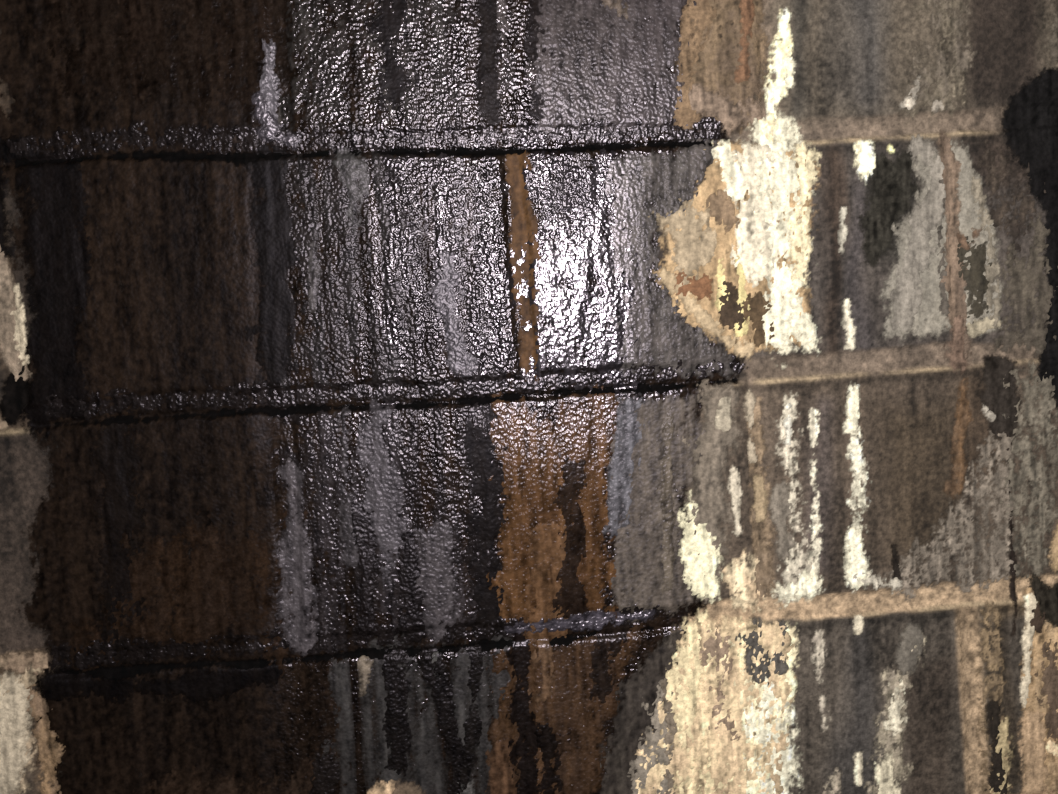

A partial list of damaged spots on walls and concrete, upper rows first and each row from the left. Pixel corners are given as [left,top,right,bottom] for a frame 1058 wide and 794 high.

damp [0,0,823,794]
rust [505,151,542,383]
damp [838,0,1058,627]
damp [853,615,864,635]
damp [976,602,1013,794]